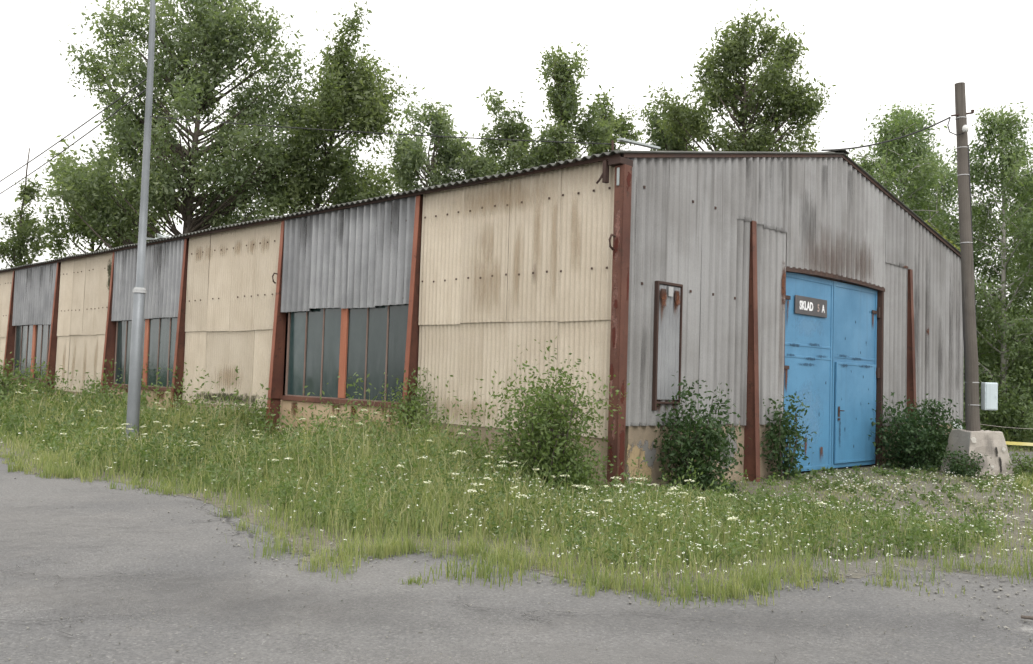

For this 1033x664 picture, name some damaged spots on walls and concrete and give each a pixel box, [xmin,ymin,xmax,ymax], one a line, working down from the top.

rust [660,292,681,312]